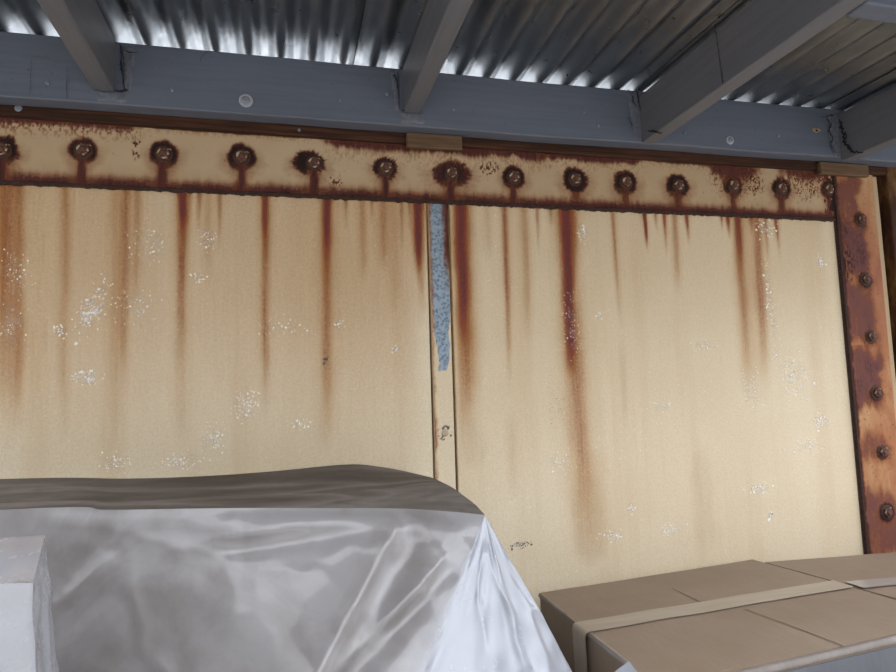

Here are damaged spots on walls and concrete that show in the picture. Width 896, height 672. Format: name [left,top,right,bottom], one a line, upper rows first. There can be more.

crack [826,114,863,153]
peeling [429,203,450,371]
corrosion [0,117,896,554]